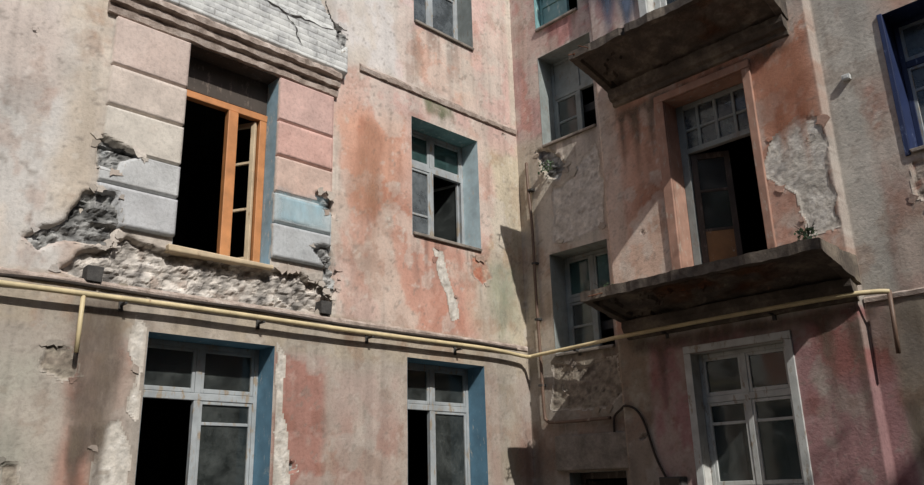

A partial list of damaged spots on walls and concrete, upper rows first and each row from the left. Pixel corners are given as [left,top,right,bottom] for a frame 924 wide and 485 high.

crack [267,0,343,46]
flaking render [91,130,149,176]
flaking render [533,147,571,182]
peeling [764,114,842,236]
flaking render [908,158,924,203]
flaking render [19,184,343,315]
peeling [432,246,459,321]
flaking render [37,339,84,384]
peeling [87,315,147,485]
peeling [272,342,299,485]
flaking render [0,456,22,485]